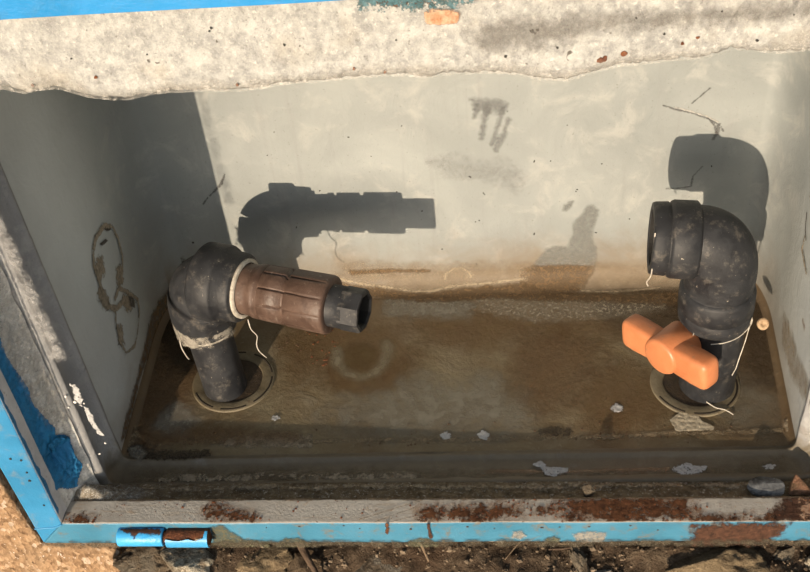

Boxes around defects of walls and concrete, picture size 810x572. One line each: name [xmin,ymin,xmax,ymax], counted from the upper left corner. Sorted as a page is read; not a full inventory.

crack [663,88,724,140]
damp [340,207,681,328]
damp [121,293,197,440]
damp [137,342,557,448]
damp [743,303,774,386]
corrosion [202,500,262,523]
corrosion [409,497,810,547]